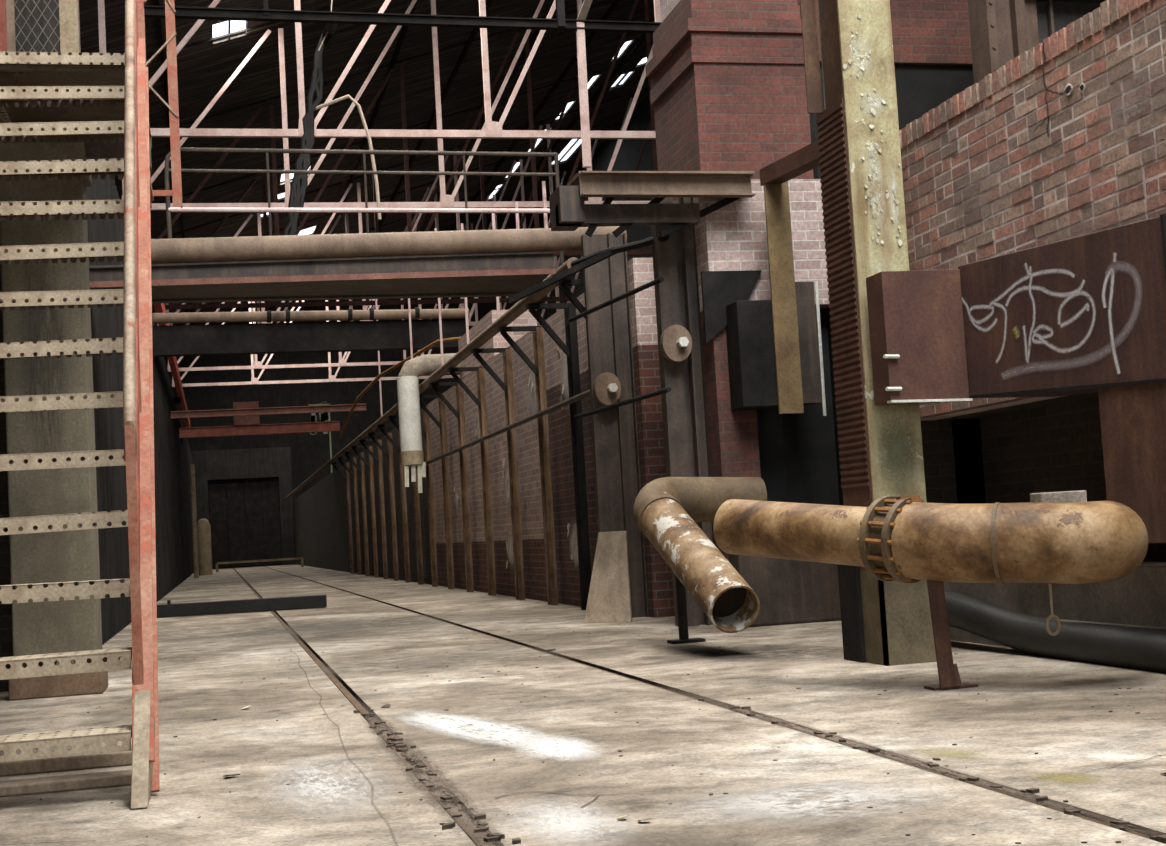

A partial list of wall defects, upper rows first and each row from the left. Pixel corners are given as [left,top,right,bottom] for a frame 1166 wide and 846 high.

peeling [843,14,871,77]
peeling [860,88,902,246]